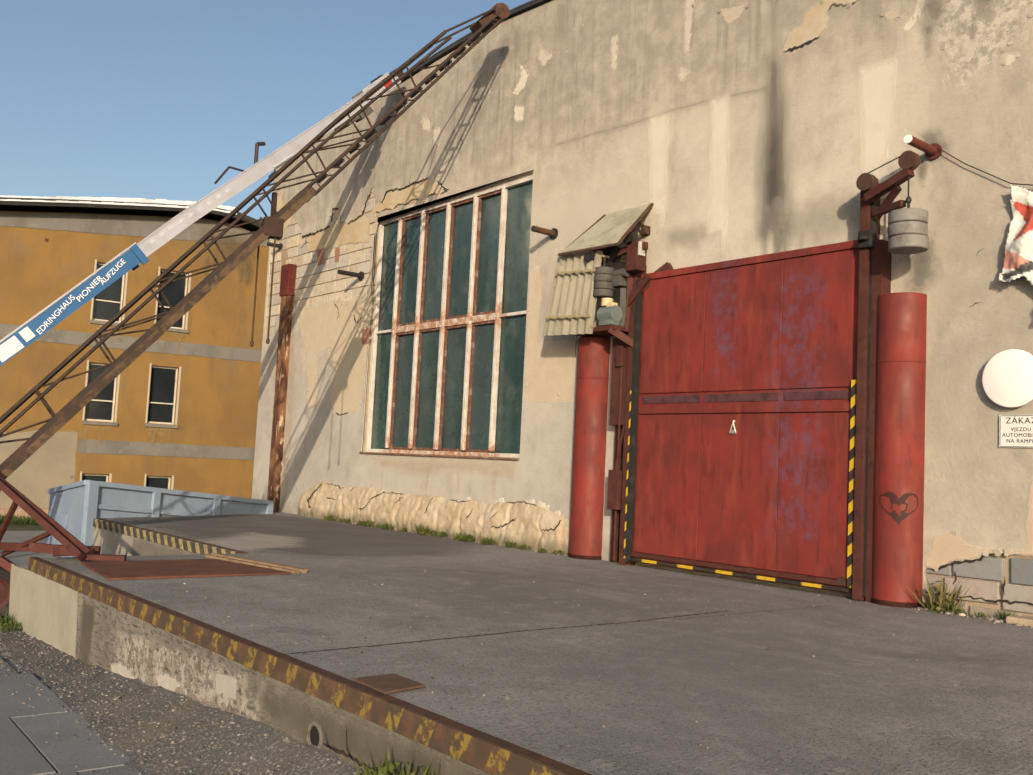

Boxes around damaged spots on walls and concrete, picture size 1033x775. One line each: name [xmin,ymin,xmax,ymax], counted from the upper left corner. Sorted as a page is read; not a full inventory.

peeling [784,0,858,51]
peeling [880,0,926,31]
leakage [924,0,942,46]
peeling [935,0,1033,92]
peeling [513,65,530,121]
leakage [759,58,790,253]
spalling [265,171,444,414]
spalling [925,482,1033,618]